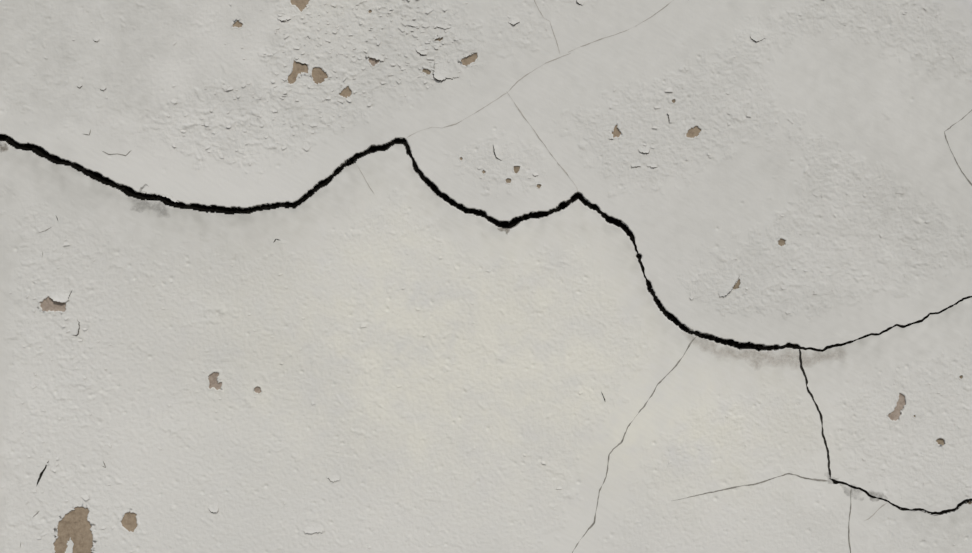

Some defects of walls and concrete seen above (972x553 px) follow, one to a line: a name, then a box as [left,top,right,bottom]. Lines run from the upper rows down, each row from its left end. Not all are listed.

peeling [230,18,245,31]
crack [578,2,671,48]
crack [472,0,576,186]
peeling [36,290,80,336]
crack [0,118,972,553]
peeling [886,390,917,425]
peeling [50,503,97,553]